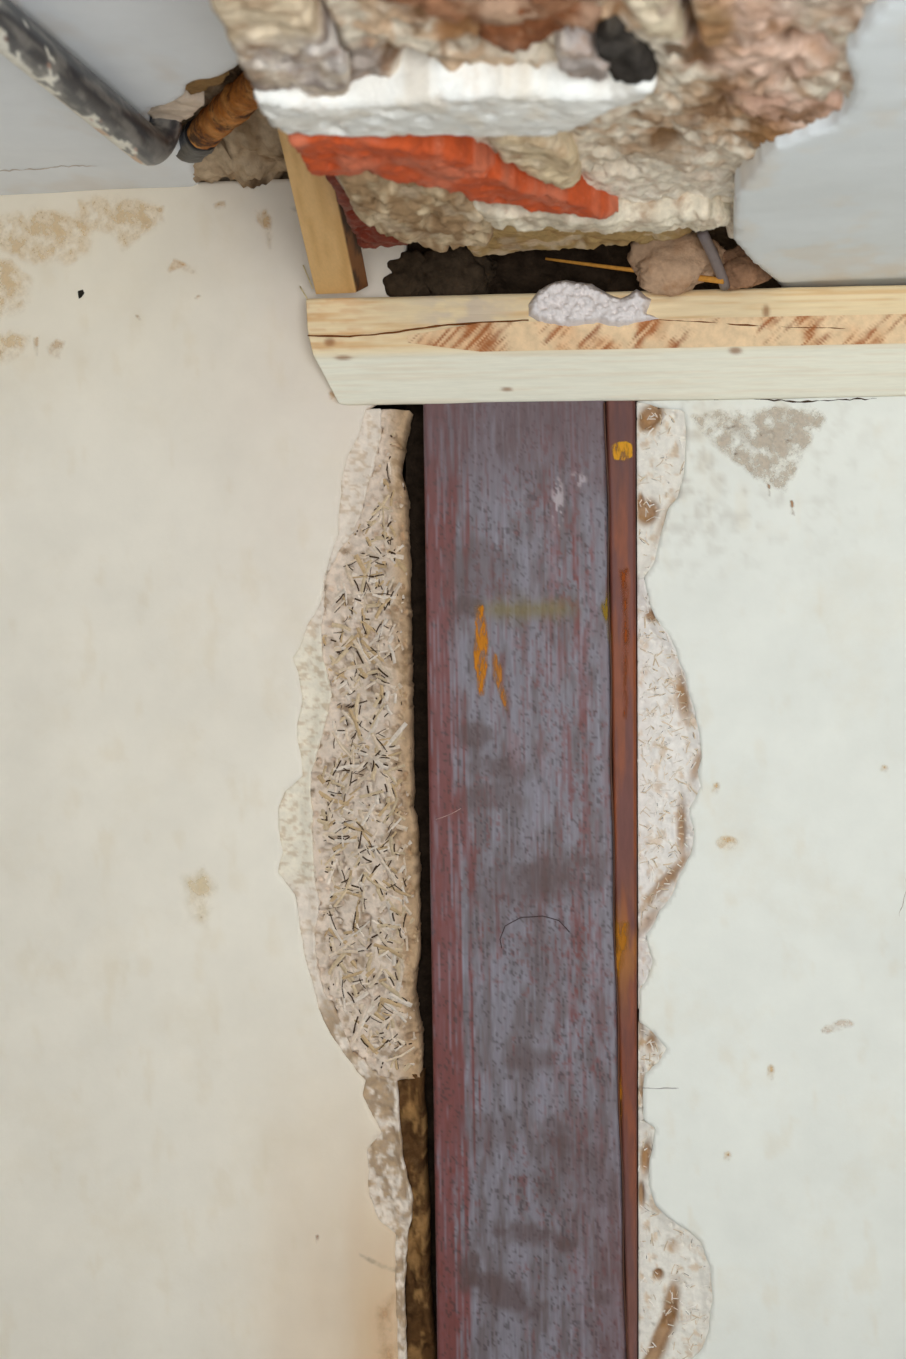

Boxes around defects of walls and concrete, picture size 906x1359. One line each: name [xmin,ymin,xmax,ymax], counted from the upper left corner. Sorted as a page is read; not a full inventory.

flaking render [148,0,875,257]
corrosion [613,441,632,460]
corrosion [474,605,506,707]
corrosion [601,569,628,716]
spalling [278,404,437,1359]
corrosion [616,923,627,975]